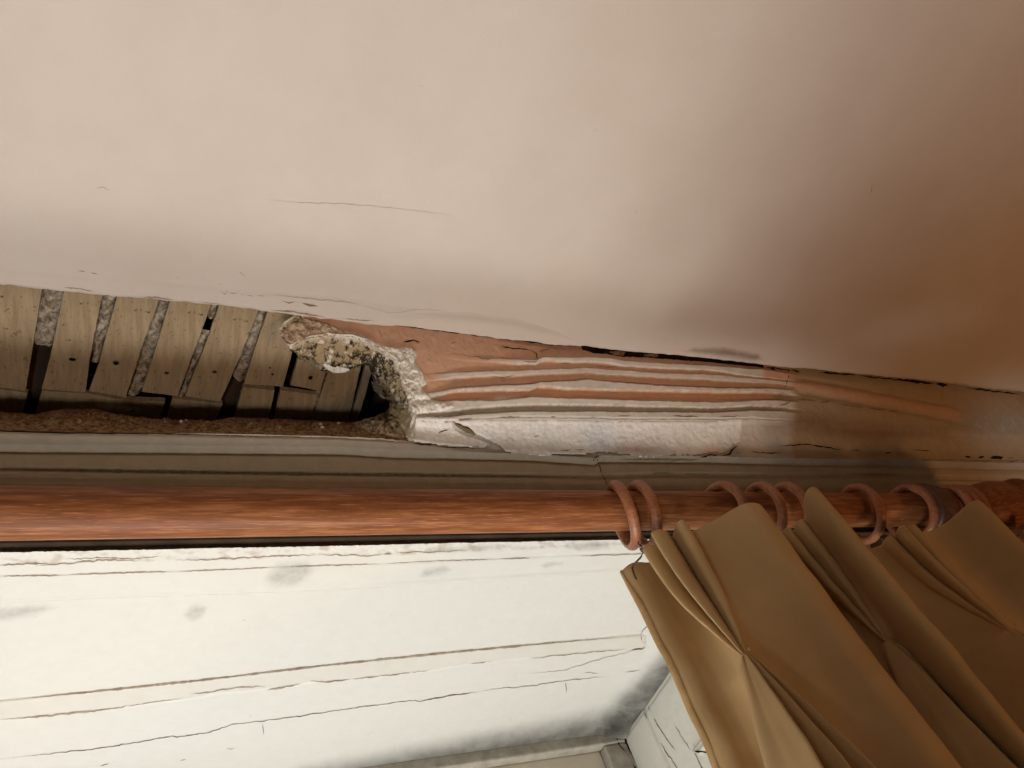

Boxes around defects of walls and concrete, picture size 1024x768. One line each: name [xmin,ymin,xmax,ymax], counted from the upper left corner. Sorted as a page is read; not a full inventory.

peeling [0,301,743,457]
crack [5,626,647,759]